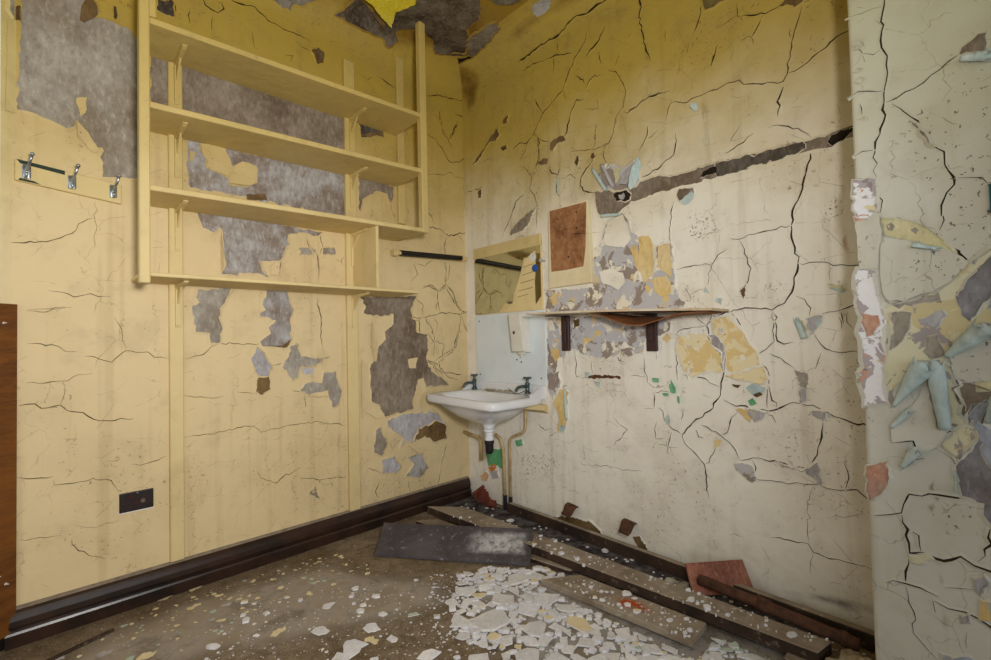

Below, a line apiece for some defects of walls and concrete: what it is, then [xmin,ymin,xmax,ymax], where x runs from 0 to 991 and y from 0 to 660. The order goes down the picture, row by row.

peeling [15,0,138,182]
peeling [333,0,522,65]
crack [503,0,667,237]
crack [11,201,98,250]
crack [19,455,167,492]
crack [19,290,217,422]
peeling [189,213,344,409]
peeling [360,295,450,499]
crack [411,94,487,381]
peeling [537,103,866,454]
crack [638,0,991,659]
peeling [850,176,991,529]